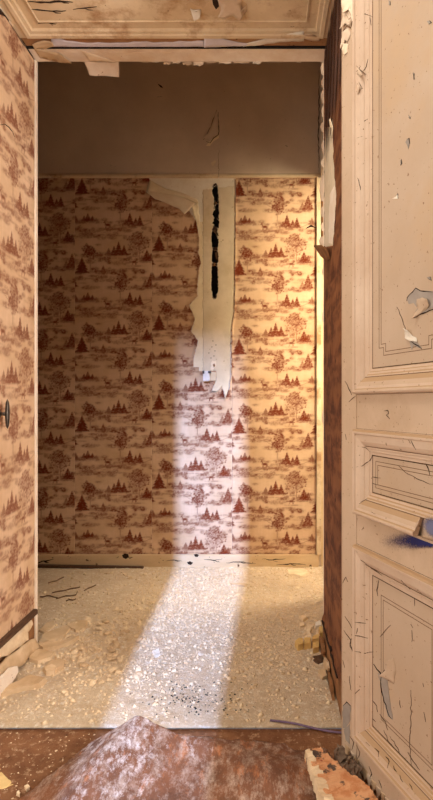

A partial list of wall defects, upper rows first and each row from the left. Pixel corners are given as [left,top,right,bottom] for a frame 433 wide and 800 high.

crack [27,0,97,24]
peeling [32,31,320,64]
peeling [339,0,352,56]
flaking render [318,62,336,247]
flaking render [149,177,236,254]
peeling [407,288,433,319]
peeling [403,328,422,350]
crack [343,617,426,790]